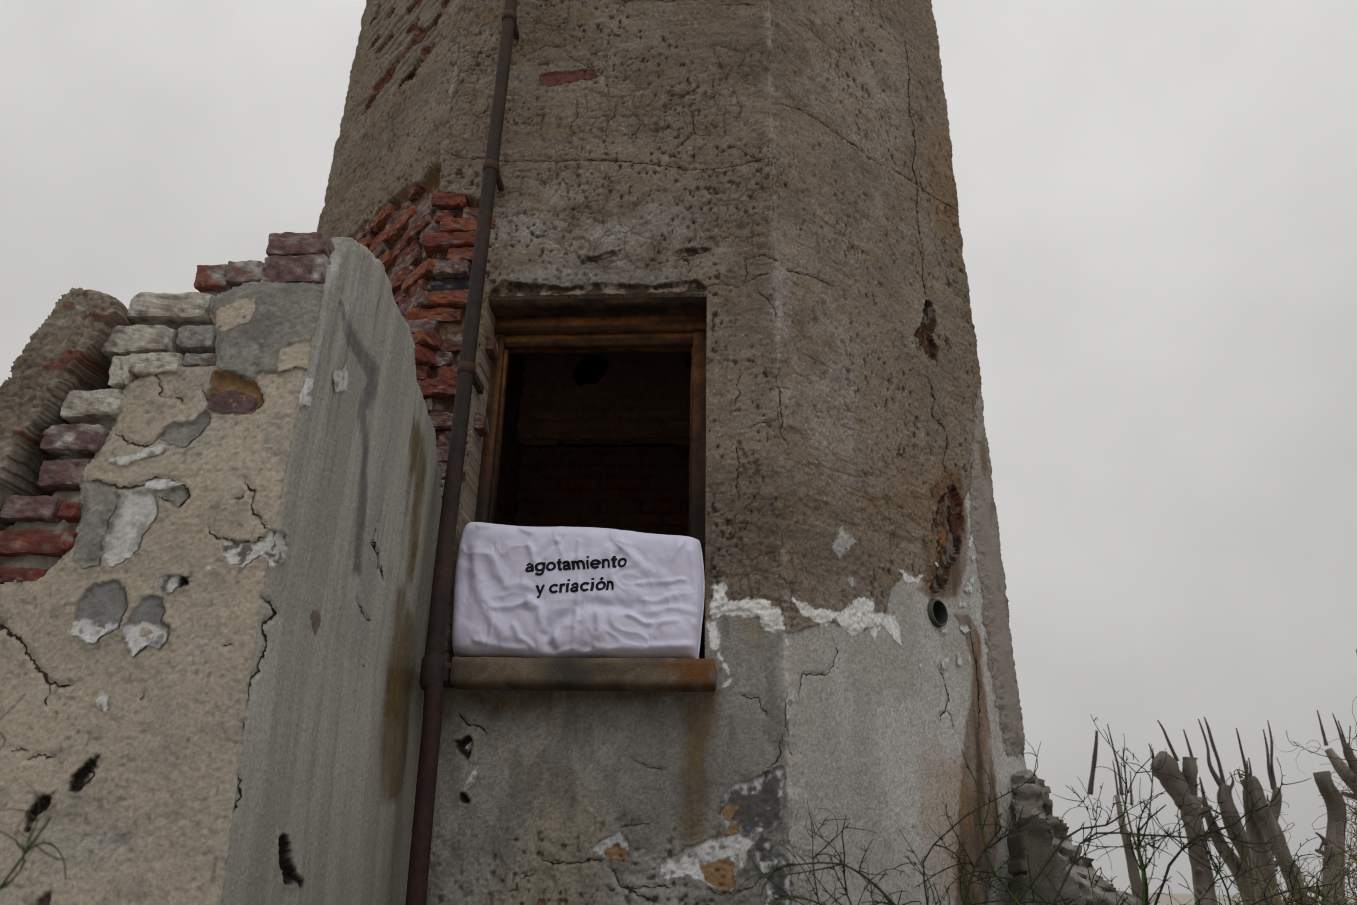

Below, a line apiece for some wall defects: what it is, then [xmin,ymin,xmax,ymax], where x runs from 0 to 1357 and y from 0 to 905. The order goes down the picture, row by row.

spalling [362,0,450,115]
crack [444,35,955,297]
peeling [207,281,324,414]
spalling [353,185,496,499]
spalling [489,279,707,297]
spalling [914,300,939,363]
crack [931,385,951,479]
flaking render [70,479,188,657]
crack [209,482,271,543]
spalling [929,485,976,607]
crack [0,626,72,706]
spalling [660,767,796,905]